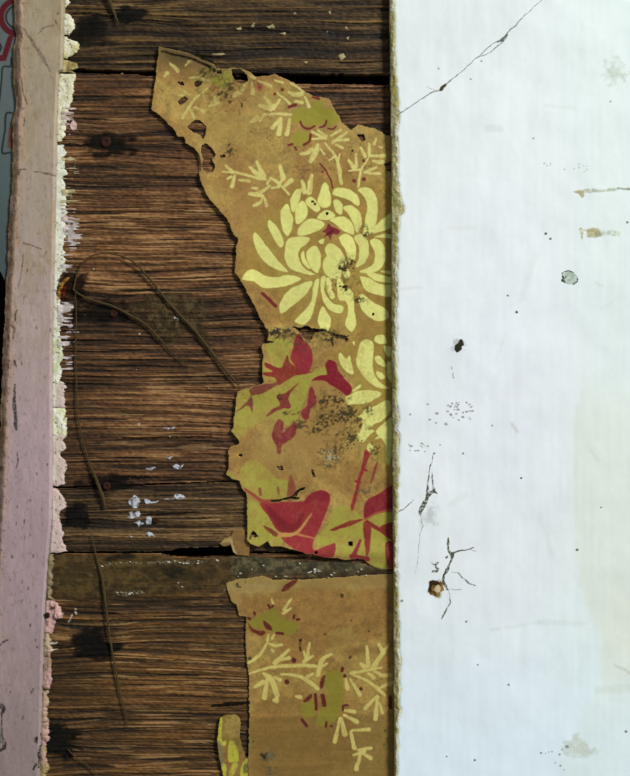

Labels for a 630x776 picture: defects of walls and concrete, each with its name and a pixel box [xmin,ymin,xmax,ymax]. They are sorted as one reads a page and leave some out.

crack [398,0,542,115]
rust [85,132,138,158]
peeling [562,270,578,285]
peeling [31,0,79,776]
crack [405,453,438,522]
crack [432,538,476,618]